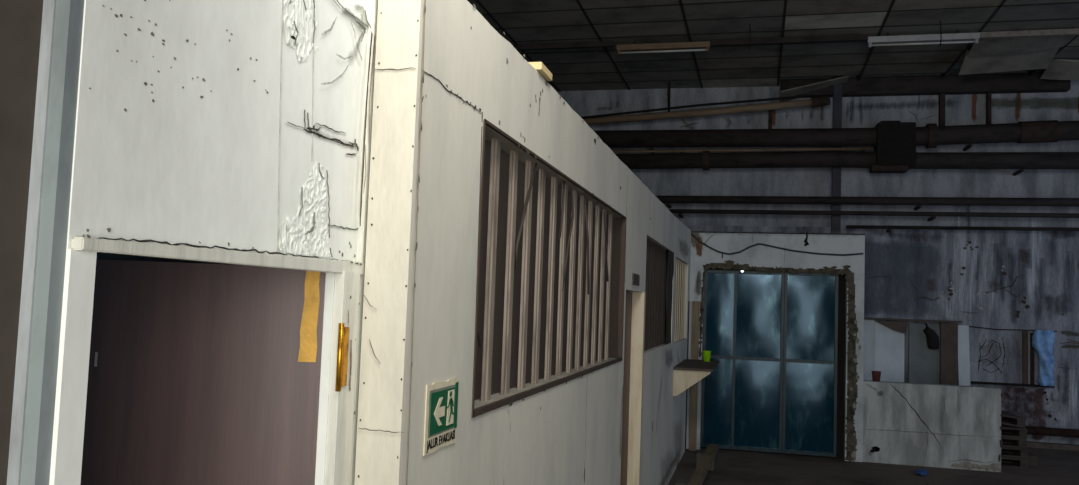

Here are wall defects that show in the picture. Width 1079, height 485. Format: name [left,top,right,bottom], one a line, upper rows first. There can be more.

damp [864,242,935,313]
crack [890,383,945,451]
peeling [951,387,1057,471]